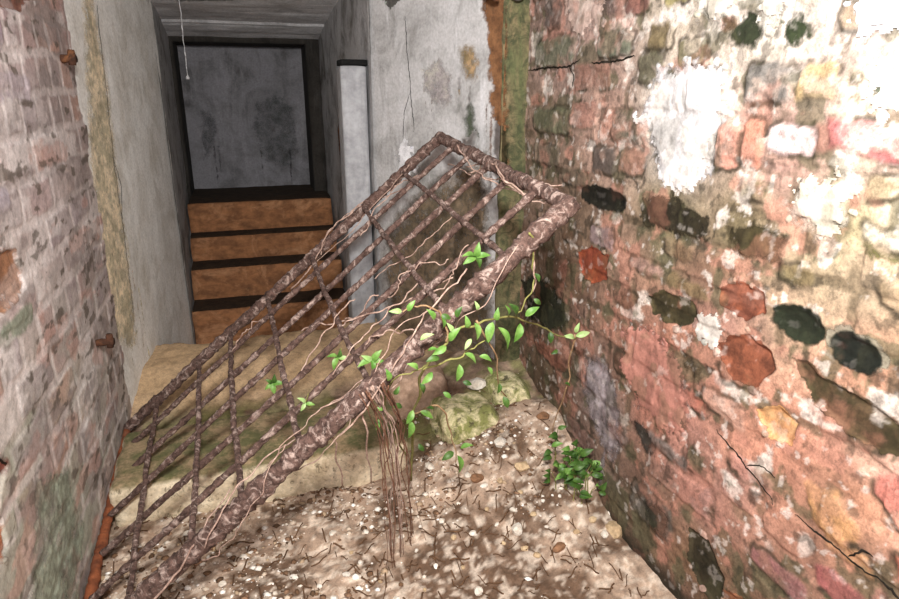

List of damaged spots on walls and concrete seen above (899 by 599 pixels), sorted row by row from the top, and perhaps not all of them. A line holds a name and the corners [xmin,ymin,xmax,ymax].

flaking render [0,0,36,12]
peeling [694,0,738,29]
peeling [756,0,786,38]
peeling [843,0,899,41]
corrosion [482,0,508,149]
peeling [861,49,899,125]
peeling [632,56,728,196]
crack [716,429,775,505]
crack [795,514,899,599]